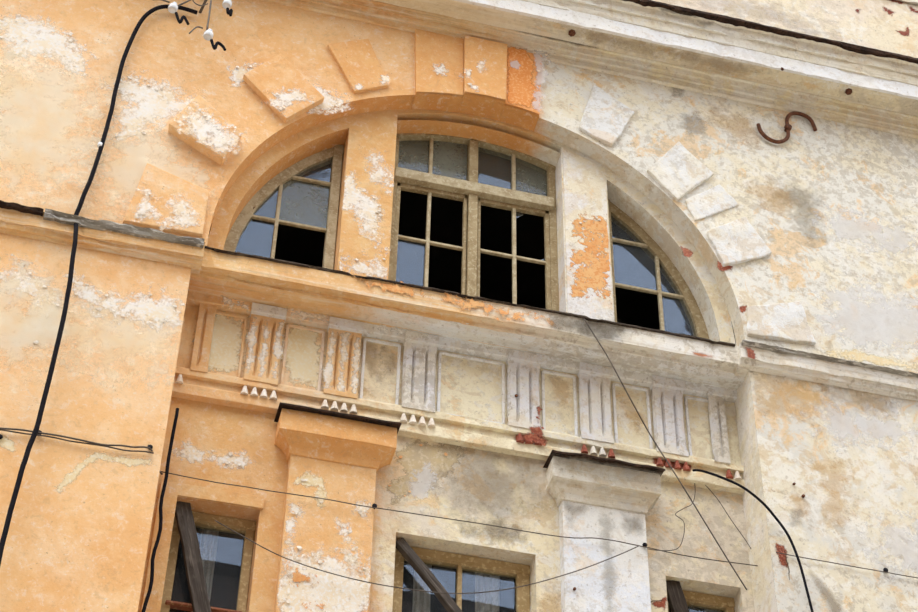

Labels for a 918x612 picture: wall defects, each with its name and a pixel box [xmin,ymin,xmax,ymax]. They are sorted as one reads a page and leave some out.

peeling [0,14,97,76]
peeling [340,153,394,278]
peeling [570,213,611,299]
peeling [0,255,184,381]
peeling [175,443,248,469]
flaking render [515,407,547,446]
peeling [294,472,326,507]
peeling [277,501,371,612]
flaking render [776,543,789,567]